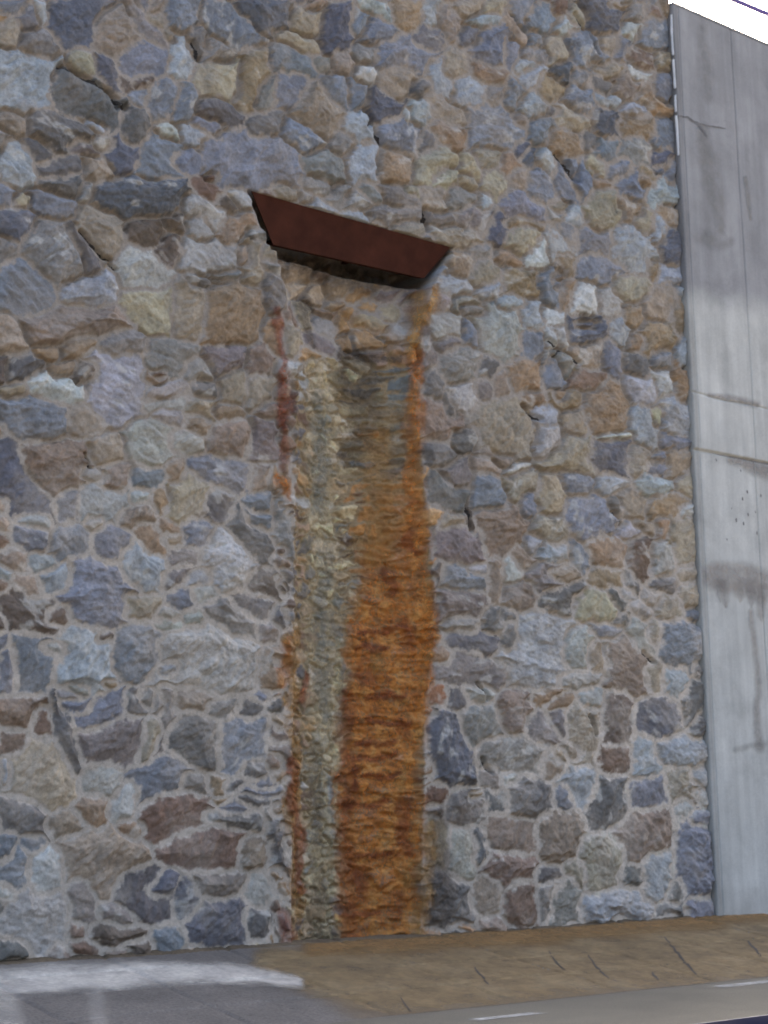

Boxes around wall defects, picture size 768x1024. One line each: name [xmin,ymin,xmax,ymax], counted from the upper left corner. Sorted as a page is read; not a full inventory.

crack [677,115,726,137]
rust [273,307,294,426]
rust [335,288,439,938]
rust [283,729,307,917]